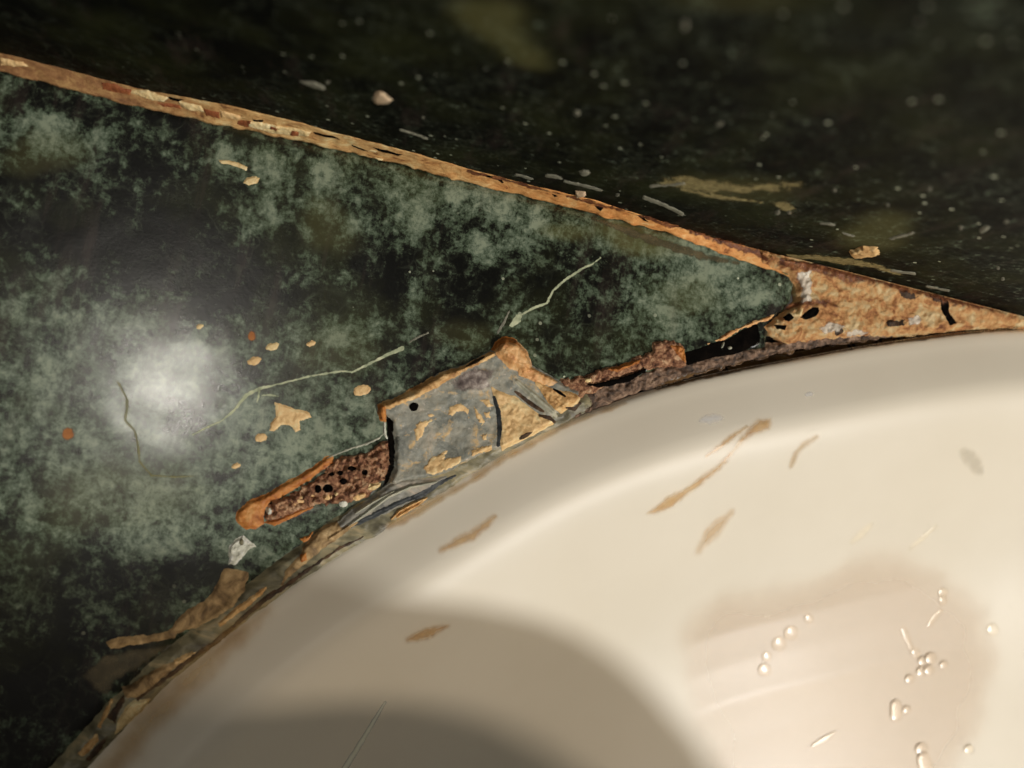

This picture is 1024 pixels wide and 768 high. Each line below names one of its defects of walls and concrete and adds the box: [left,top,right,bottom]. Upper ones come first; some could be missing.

crack [497,257,601,334]
corrosion [779,258,998,311]
corrosion [707,315,774,345]
corrosion [560,340,686,398]
peeling [235,336,581,530]
corrosion [713,421,769,461]
corrosion [654,478,704,511]
peeling [218,587,267,626]
peeling [115,698,150,734]